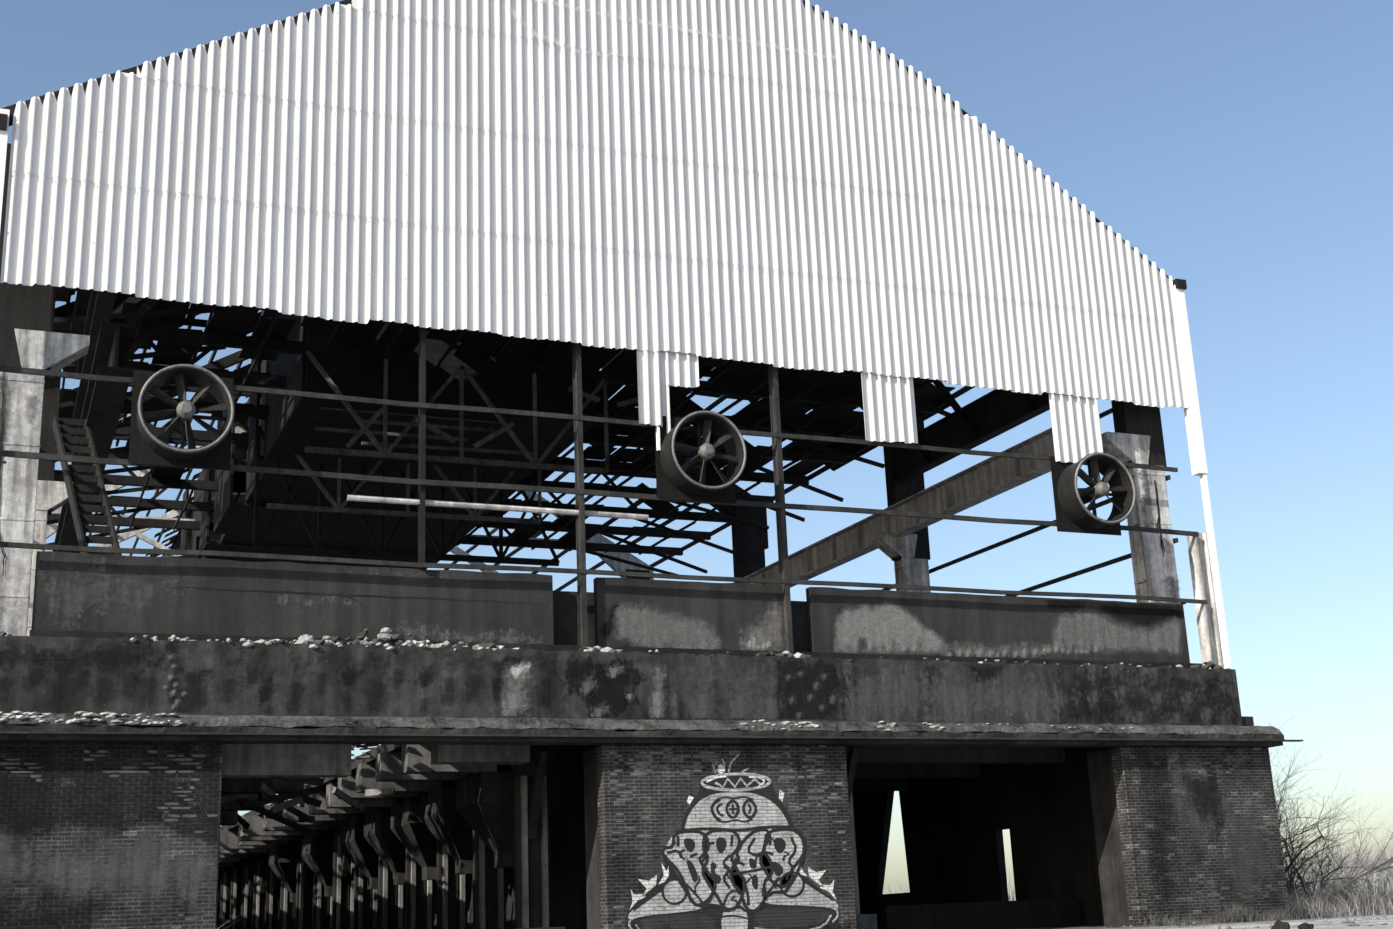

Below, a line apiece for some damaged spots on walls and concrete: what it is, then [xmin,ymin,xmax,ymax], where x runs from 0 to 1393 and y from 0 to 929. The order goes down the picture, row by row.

flaking render [565,604,950,856]
flaking render [978,610,1183,668]